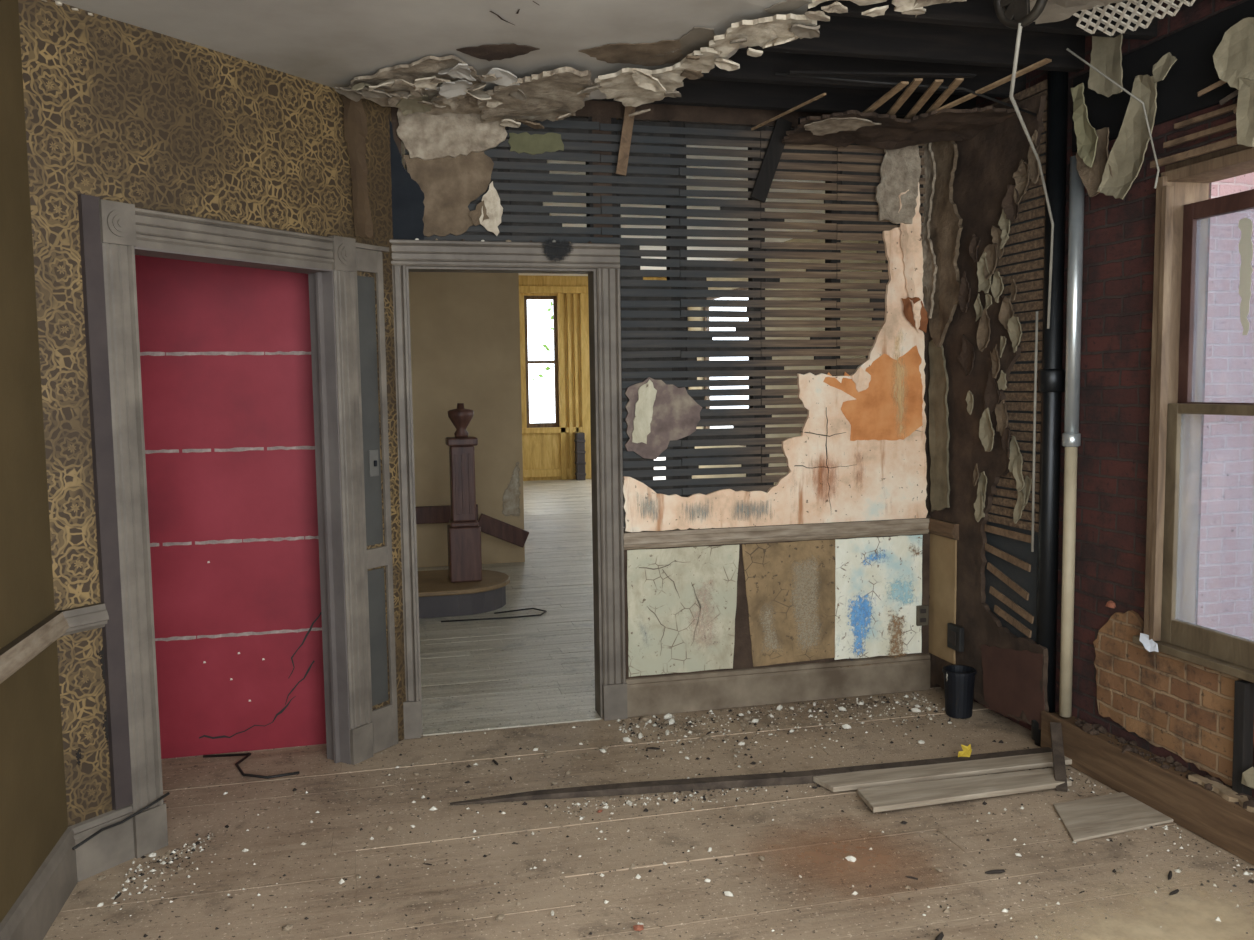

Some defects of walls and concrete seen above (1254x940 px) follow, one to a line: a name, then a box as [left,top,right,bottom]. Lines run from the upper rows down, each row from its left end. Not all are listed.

peeling [579,0,967,98]
flaking render [1072,0,1254,168]
flaking render [334,43,1049,729]
crack [639,561,701,655]
leakage [888,611,906,658]
flaking render [1093,610,1254,813]